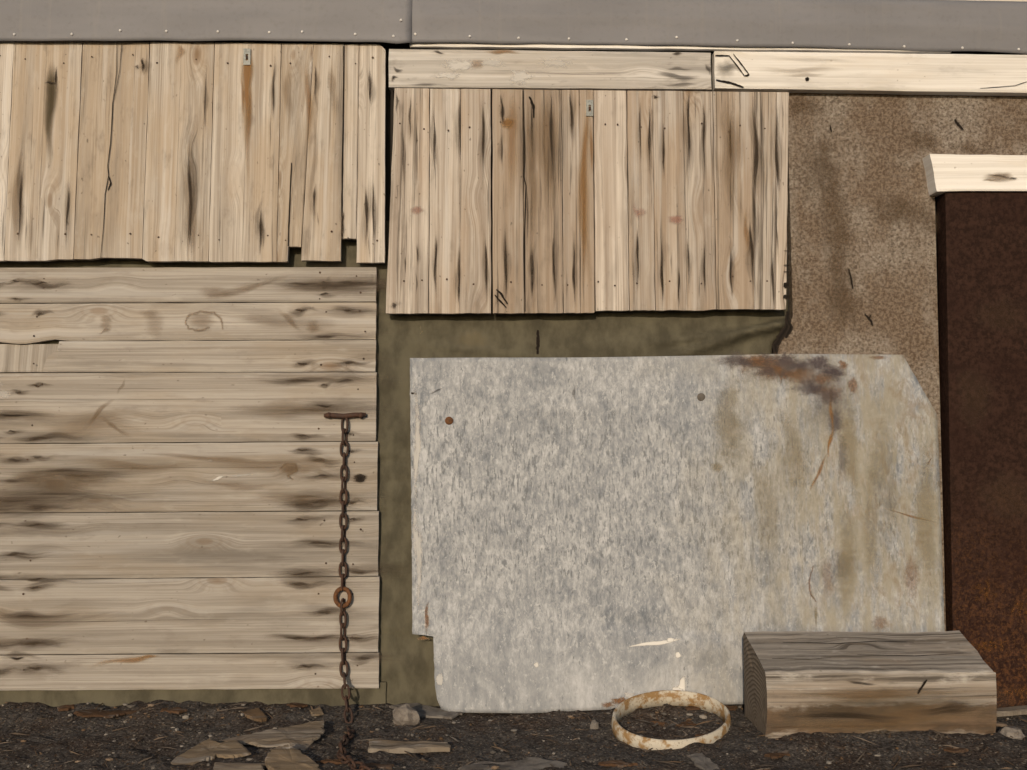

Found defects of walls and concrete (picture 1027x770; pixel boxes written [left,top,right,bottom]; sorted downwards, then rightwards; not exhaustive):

crack [100,43,122,258]
corrosion [741,353,856,391]
corrosion [813,401,840,483]